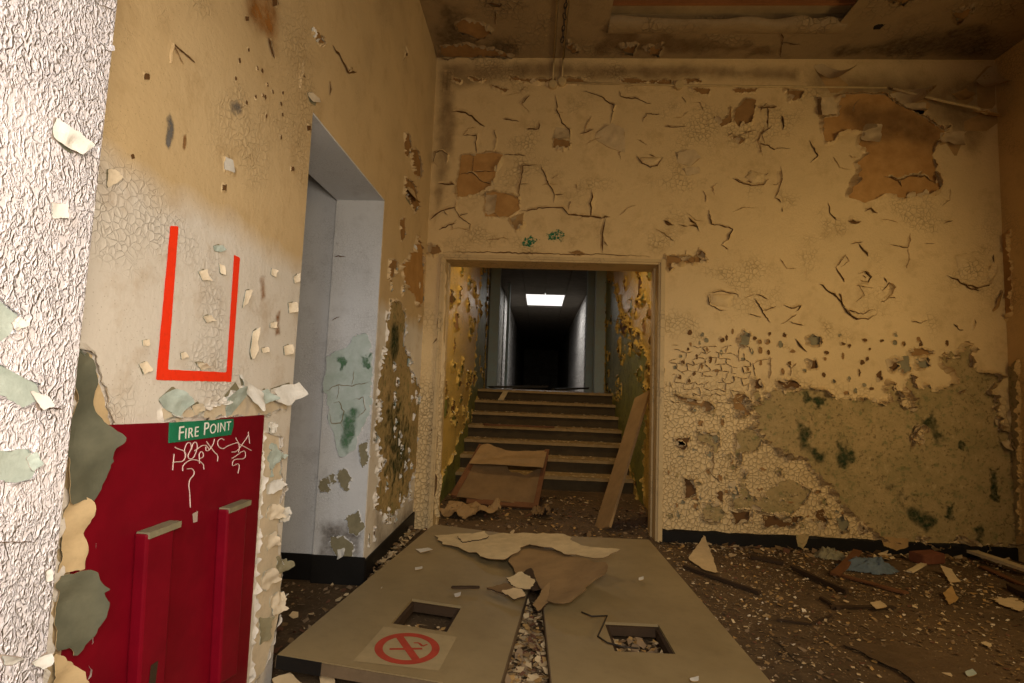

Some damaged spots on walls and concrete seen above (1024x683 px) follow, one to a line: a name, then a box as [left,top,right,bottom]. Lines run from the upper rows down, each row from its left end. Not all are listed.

peeling [0,343,127,683]
peeling [157,375,308,683]
peeling [318,131,443,559]
crack [428,86,704,518]
crack [668,293,822,404]
crack [655,102,857,263]
damp [799,424,824,461]
damp [803,391,826,407]
peeling [665,328,1024,573]
damp [837,443,855,469]
crack [820,171,953,308]
damp [908,506,954,530]